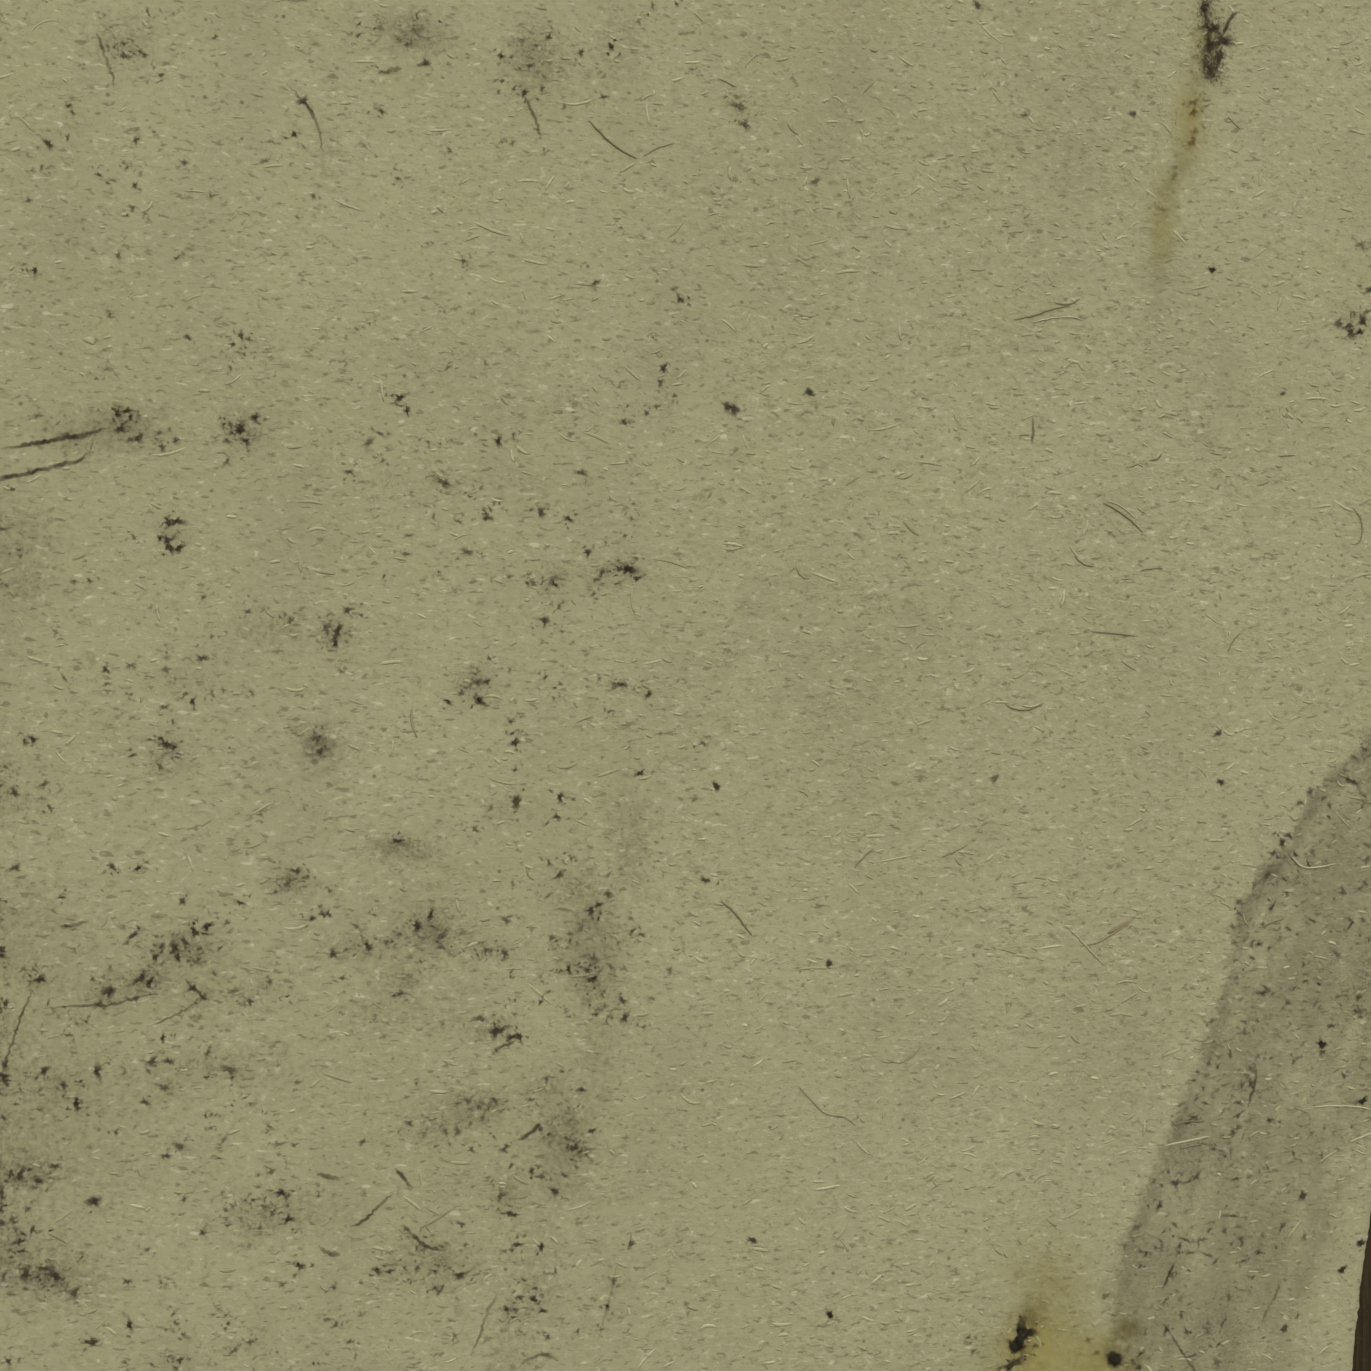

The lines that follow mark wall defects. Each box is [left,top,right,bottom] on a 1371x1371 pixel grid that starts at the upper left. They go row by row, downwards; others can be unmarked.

corrosion [1197,0,1231,83]